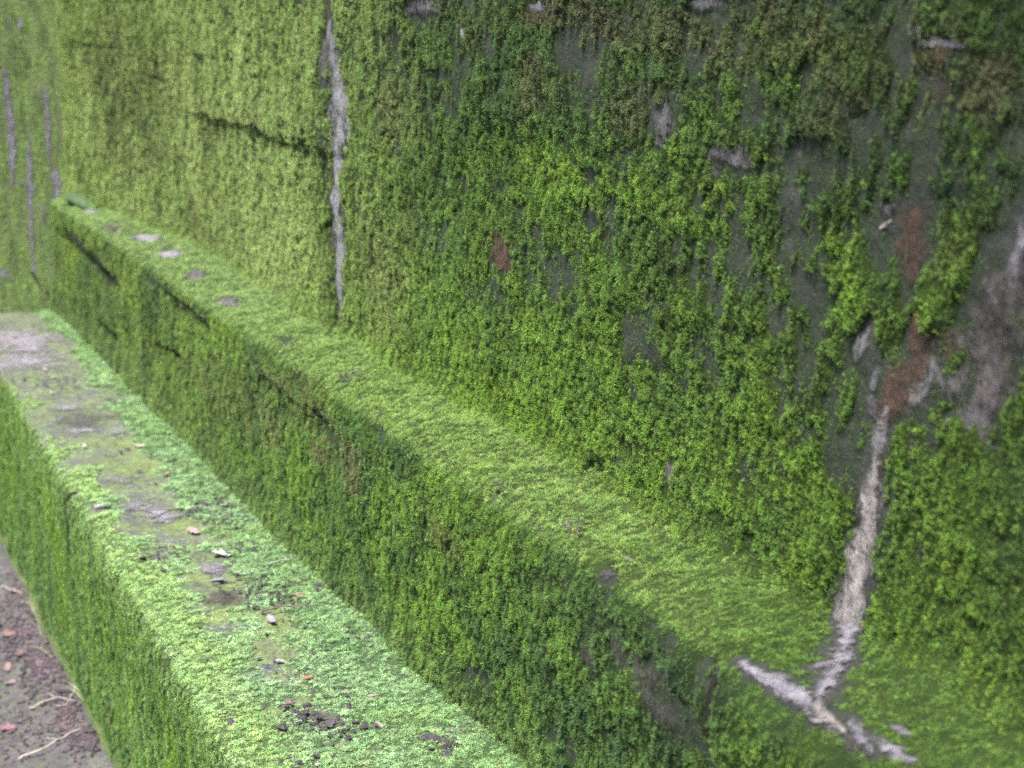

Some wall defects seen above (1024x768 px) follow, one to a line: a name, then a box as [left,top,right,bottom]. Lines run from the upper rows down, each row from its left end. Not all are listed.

corrosion [876,310,964,437]
corrosion [876,453,886,473]
crack [703,407,889,753]